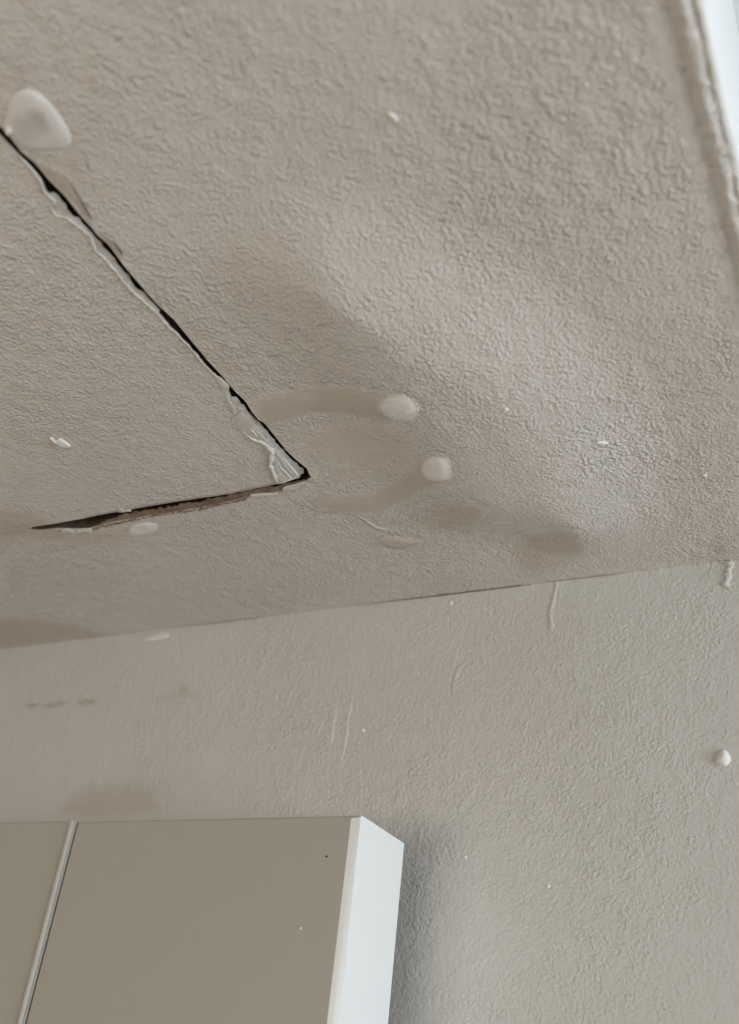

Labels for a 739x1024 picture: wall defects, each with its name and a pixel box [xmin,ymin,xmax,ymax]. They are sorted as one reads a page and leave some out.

crack [0,127,396,535]
damp [273,416,428,493]